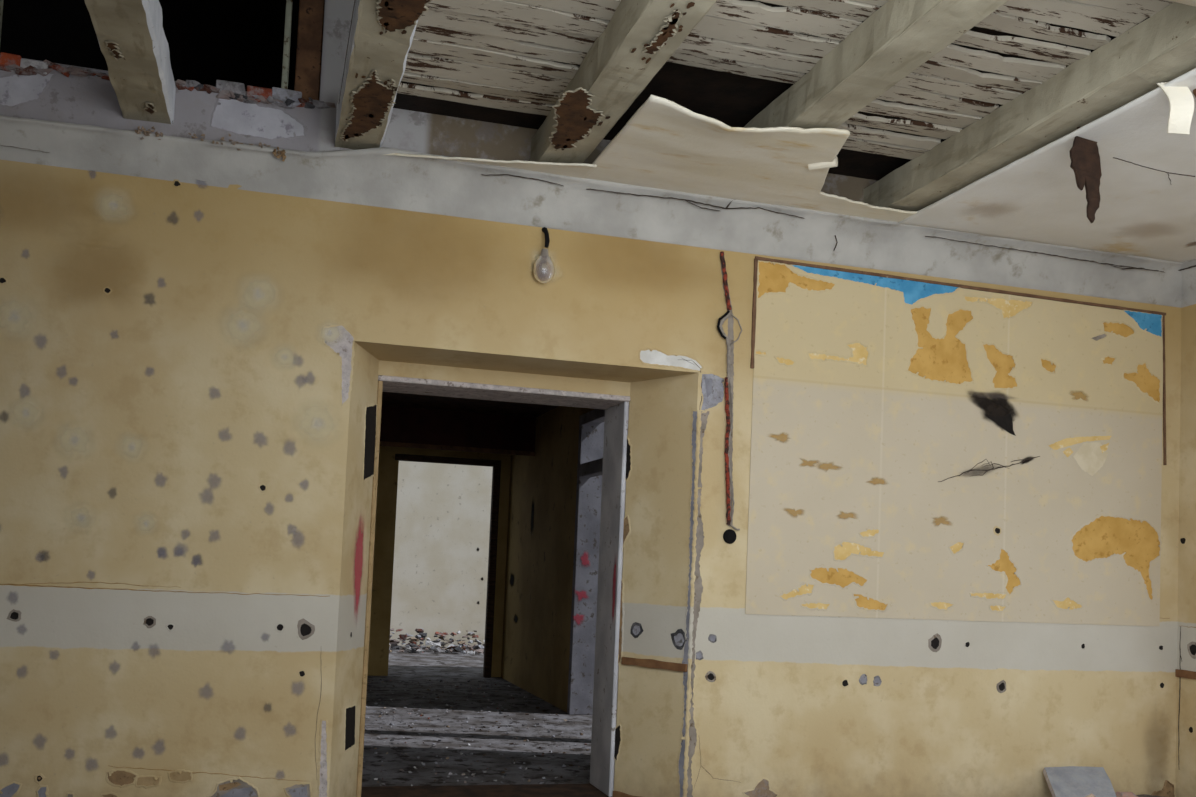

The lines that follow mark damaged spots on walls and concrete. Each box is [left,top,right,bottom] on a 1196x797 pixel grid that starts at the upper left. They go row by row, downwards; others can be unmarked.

peeling [376,0,432,35]
peeling [548,87,610,150]
peeling [808,156,838,171]
crack [481,174,805,219]
peeling [754,260,1033,390]
crack [938,456,1040,482]
spalling [638,251,736,797]
peeling [778,527,889,613]
peeling [969,526,1022,613]
peeling [1070,515,1162,602]
spalling [206,776,260,797]
spalling [742,777,779,797]